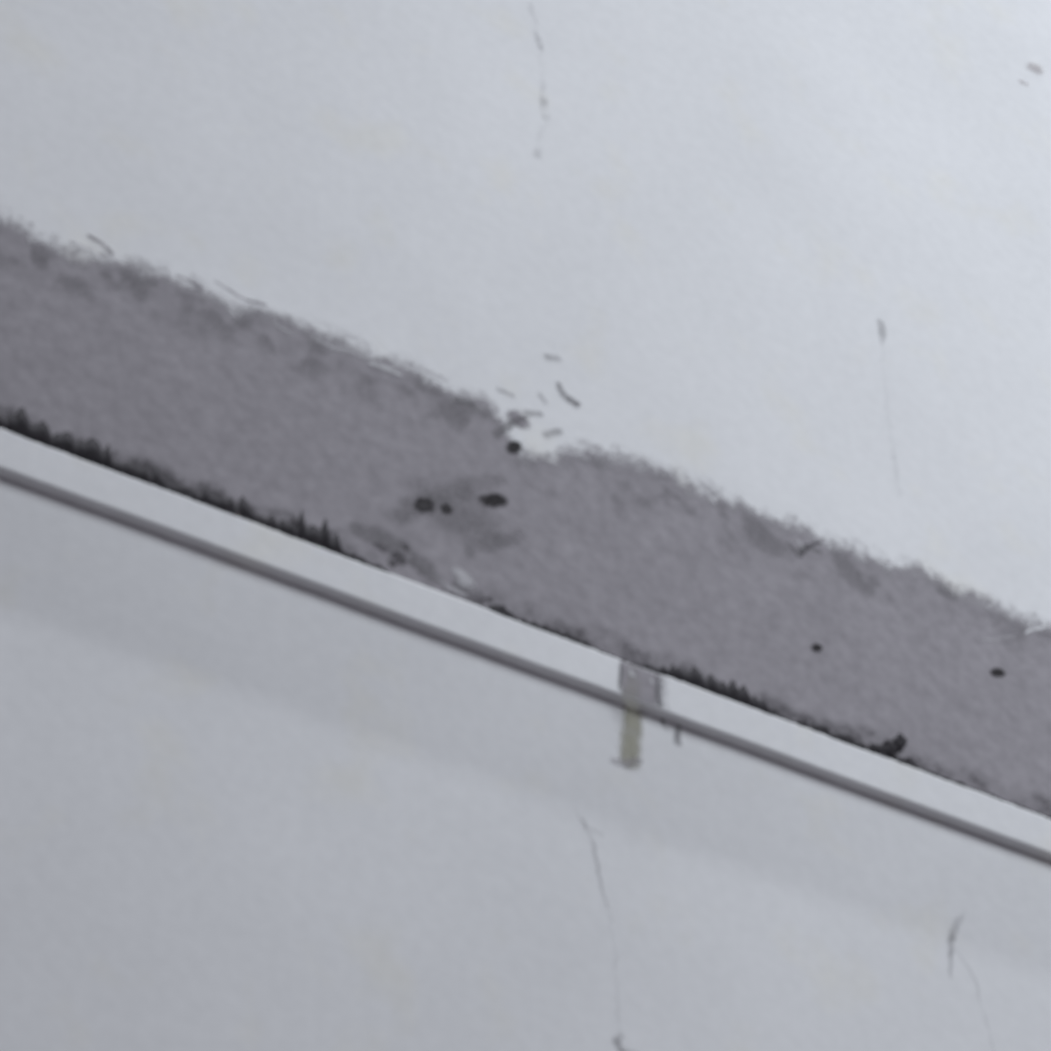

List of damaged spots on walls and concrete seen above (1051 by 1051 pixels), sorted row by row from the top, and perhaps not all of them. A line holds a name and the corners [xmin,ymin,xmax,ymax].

peeling [0,220,1051,817]